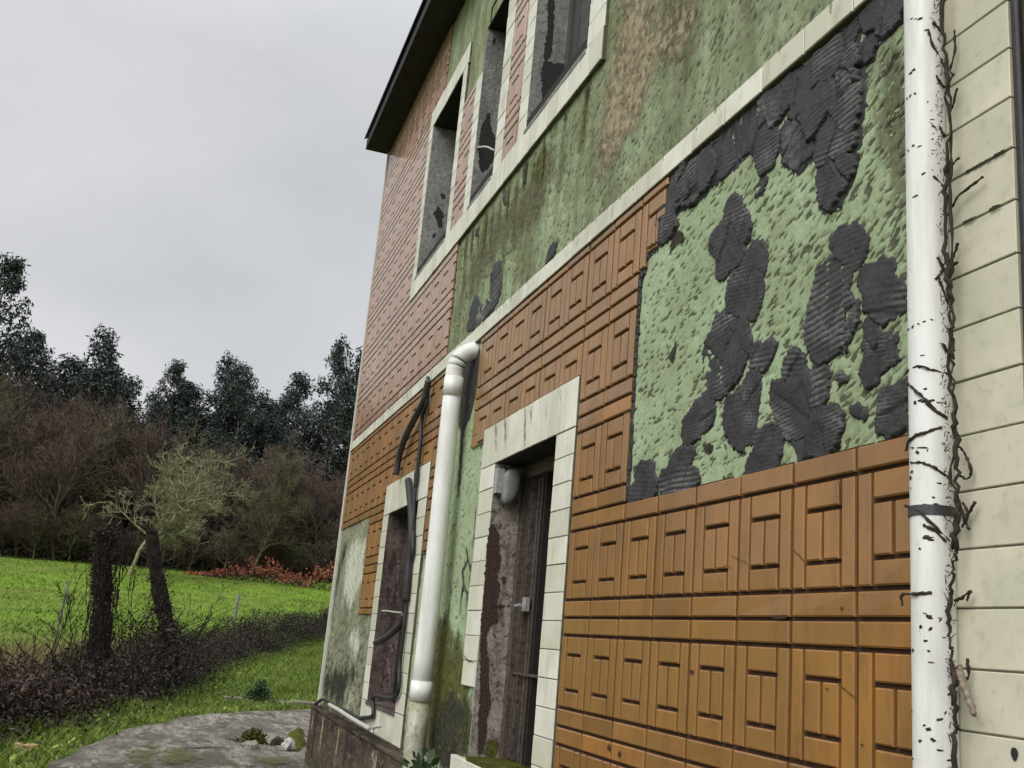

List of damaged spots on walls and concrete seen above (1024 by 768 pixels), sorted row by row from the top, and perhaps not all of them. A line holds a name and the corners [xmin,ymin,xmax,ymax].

leakage [461,84,589,300]
spalling [446,0,834,354]
spalling [624,0,909,503]
leakage [323,666,355,706]
spalling [403,554,426,753]
leakage [426,587,472,768]
crack [459,507,476,615]
spalling [439,387,510,757]